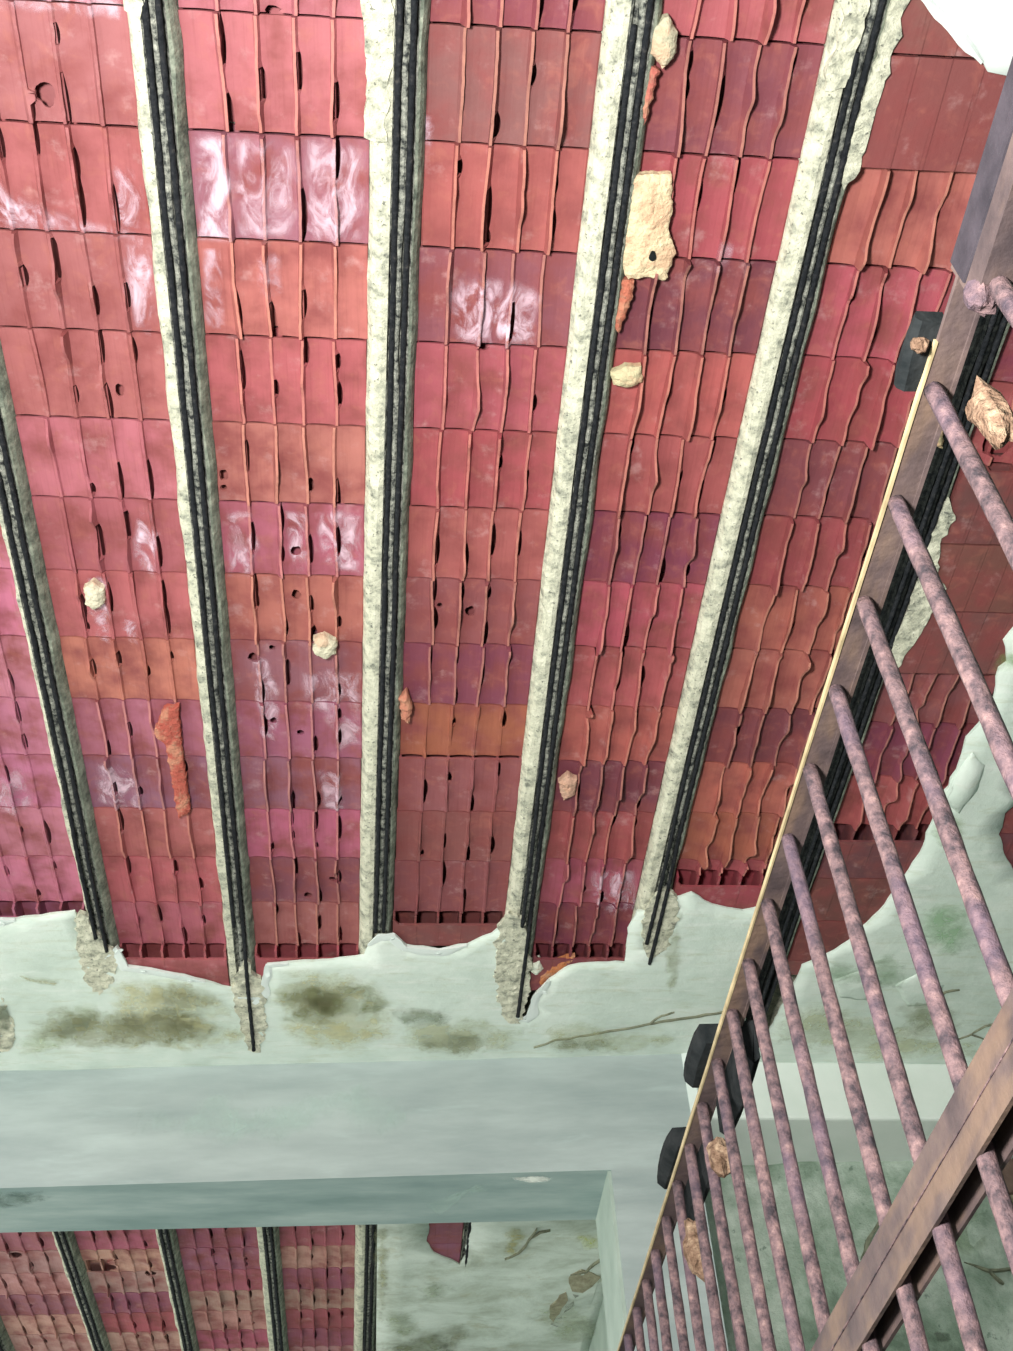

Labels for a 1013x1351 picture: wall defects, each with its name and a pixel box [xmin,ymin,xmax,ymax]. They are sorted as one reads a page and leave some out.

water stain [200,139,286,270]
water stain [311,149,357,237]
water stain [457,284,533,340]
spalling [952,307,1008,435]
spalling [123,0,288,1053]
spalling [360,0,468,956]
spalling [492,0,657,1024]
spalling [641,0,983,965]
spalling [0,407,205,995]
water stain [45,985,210,1045]
water stain [282,987,383,1042]
water stain [402,1012,478,1052]